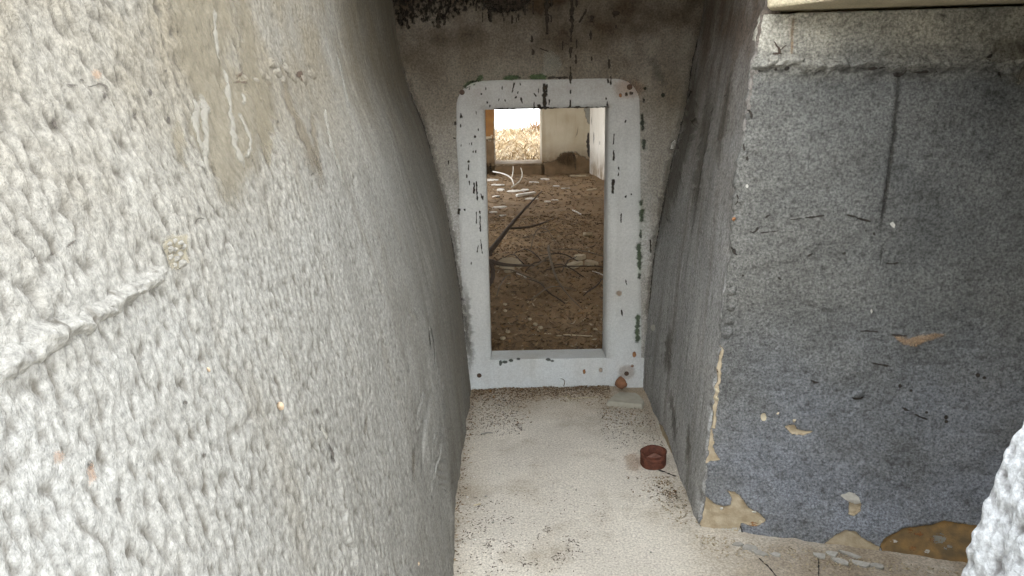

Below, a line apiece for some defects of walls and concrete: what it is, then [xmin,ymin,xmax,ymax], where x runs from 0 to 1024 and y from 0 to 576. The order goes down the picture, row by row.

water stain [393,0,553,34]
water stain [174,0,273,191]
water stain [283,83,320,167]
spalling [706,286,736,463]
spalling [785,419,813,435]
spalling [700,491,766,551]
peeling [840,492,861,516]
spalling [825,520,977,566]